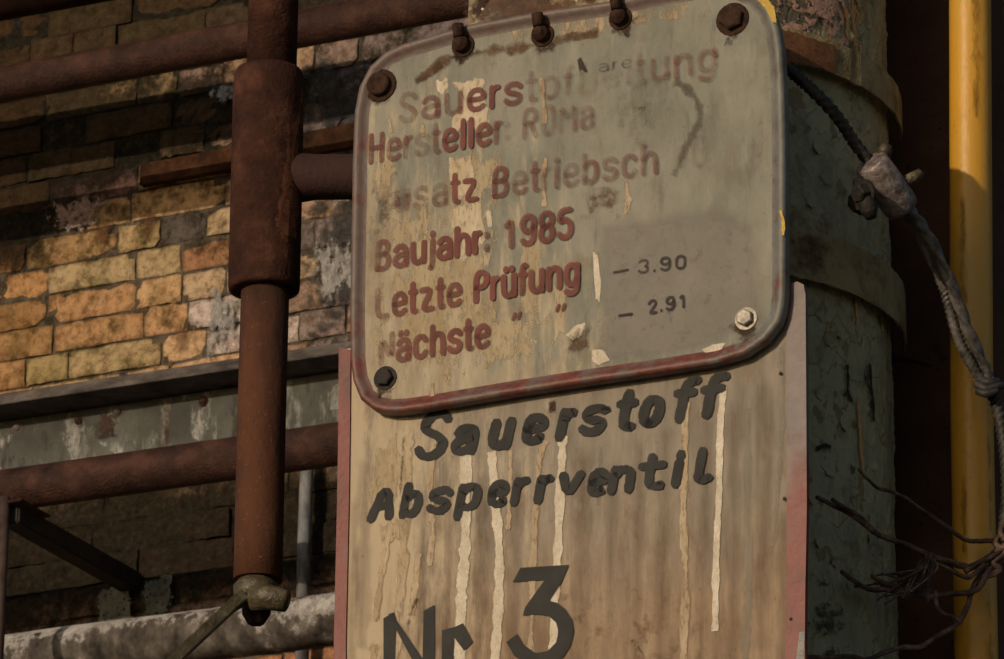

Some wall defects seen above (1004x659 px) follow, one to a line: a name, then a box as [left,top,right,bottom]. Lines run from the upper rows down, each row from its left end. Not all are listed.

peeling [775,0,865,53]